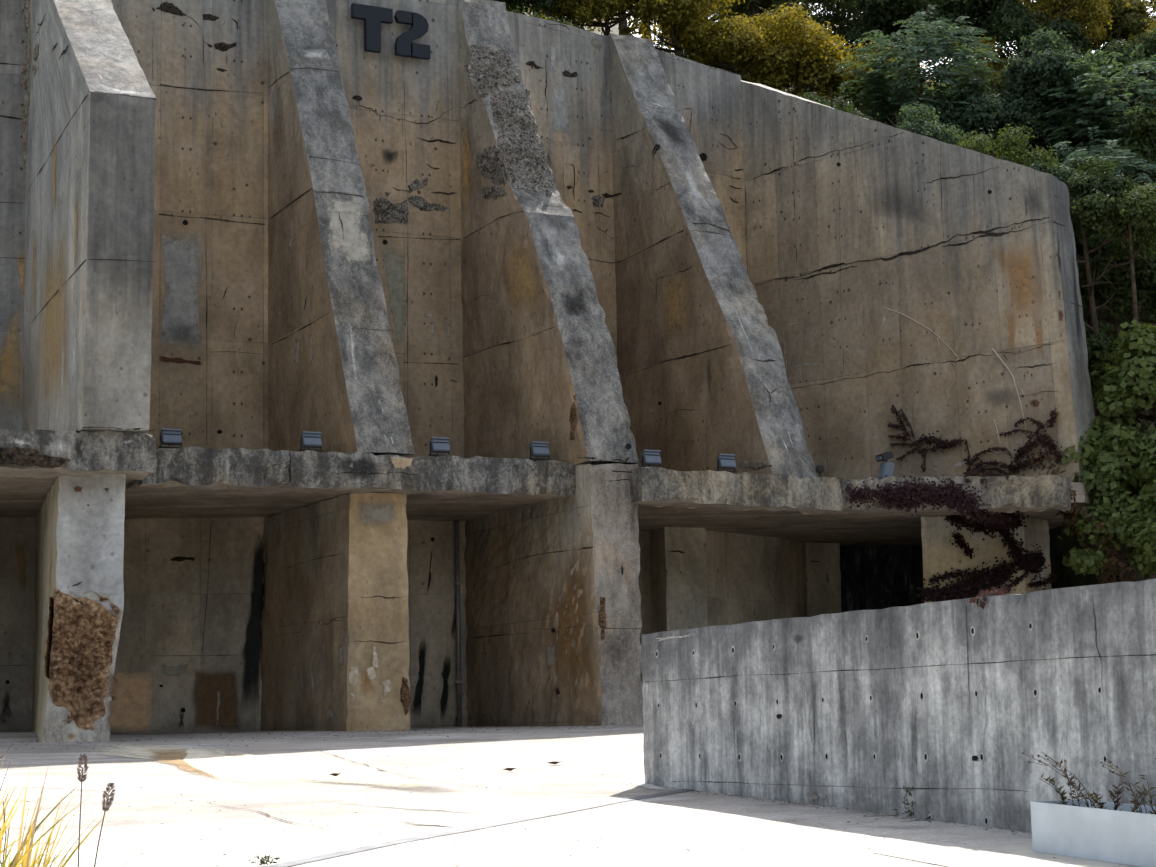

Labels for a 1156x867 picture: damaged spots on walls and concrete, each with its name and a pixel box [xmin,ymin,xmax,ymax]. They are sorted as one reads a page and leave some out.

spalling [152,2,186,16]
spalling [465,43,554,200]
crack [719,132,904,203]
crack [927,167,998,183]
peeling [328,178,451,261]
crack [755,217,1050,285]
crack [754,323,1059,411]
spalling [0,446,71,469]
leakage [243,542,267,698]
spalling [44,589,120,730]
leakage [413,643,426,713]
leakage [440,660,451,715]